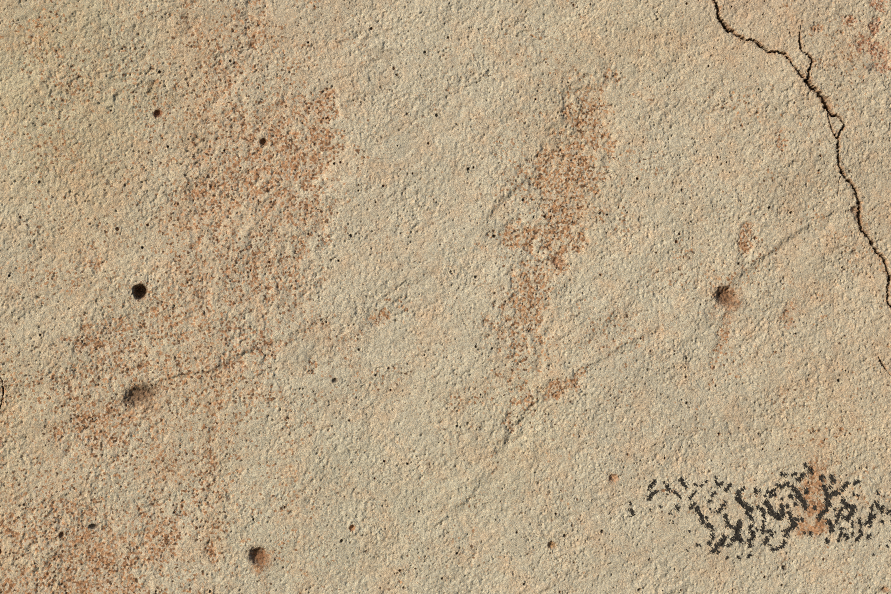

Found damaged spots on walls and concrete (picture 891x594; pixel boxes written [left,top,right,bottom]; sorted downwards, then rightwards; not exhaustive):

crack [710,0,891,313]
crack [874,352,891,382]
crack [0,372,9,419]